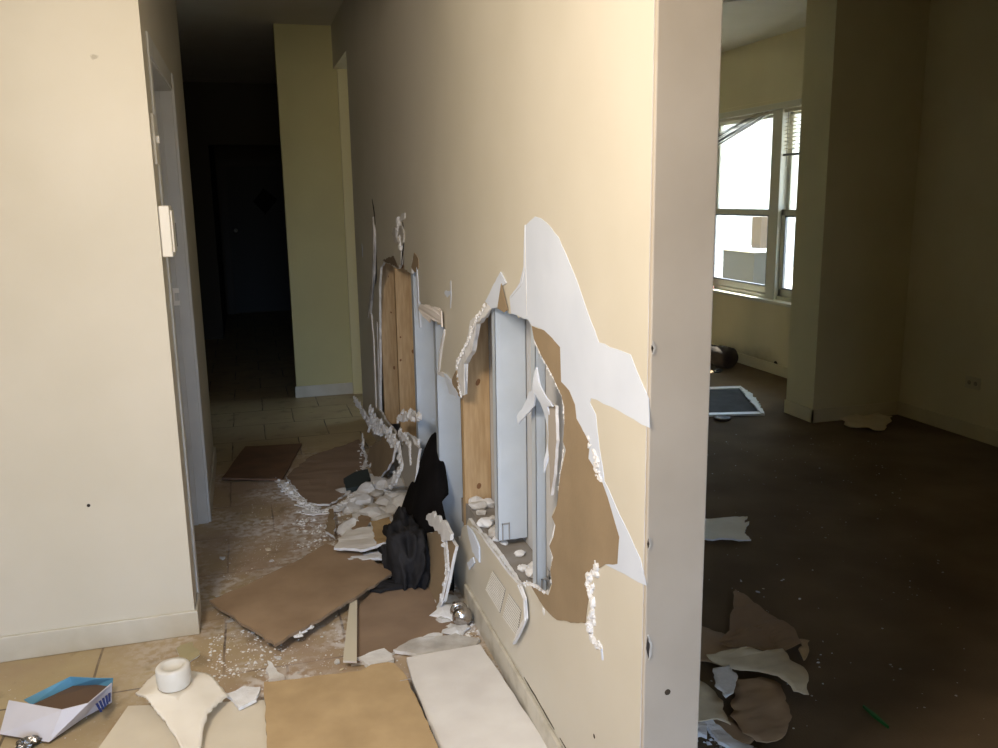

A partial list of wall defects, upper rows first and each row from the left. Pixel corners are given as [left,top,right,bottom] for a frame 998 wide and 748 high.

flaking render [392,213,405,265]
spalling [437,303,492,398]
peeling [510,217,650,660]